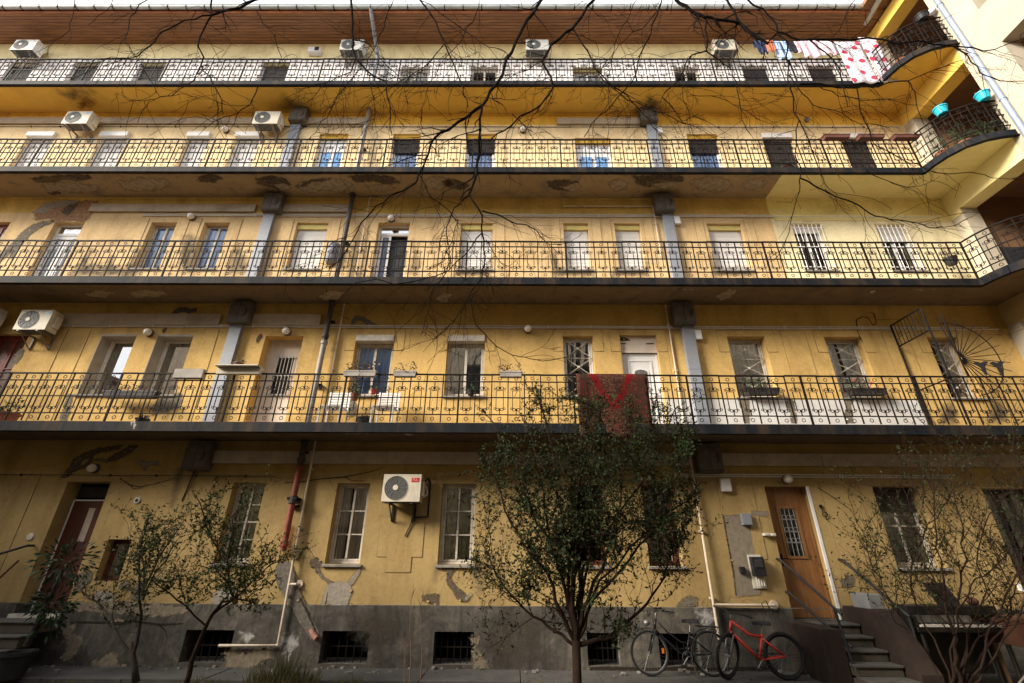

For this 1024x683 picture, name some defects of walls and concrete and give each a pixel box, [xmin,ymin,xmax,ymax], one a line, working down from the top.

flaking render [29,174,98,231]
flaking render [60,445,138,478]
flaking render [296,551,333,584]
flaking render [422,568,472,605]